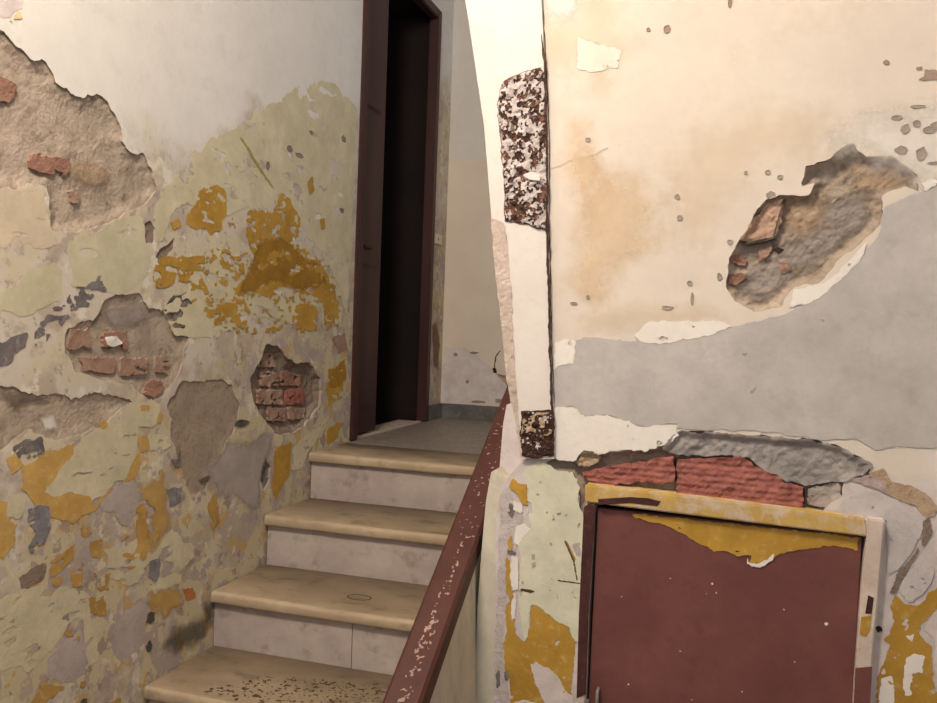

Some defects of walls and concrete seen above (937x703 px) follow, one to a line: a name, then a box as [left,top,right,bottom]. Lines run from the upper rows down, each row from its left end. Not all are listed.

peeling [0,0,24,22]
corrosion [497,67,547,230]
flaking render [717,105,937,312]
peeling [0,31,358,703]
peeling [442,218,522,457]
peeling [554,339,576,369]
peeling [634,306,731,345]
corrosion [519,409,555,459]
flaking render [493,406,872,703]
peeling [921,518,932,546]
peeling [876,588,937,703]